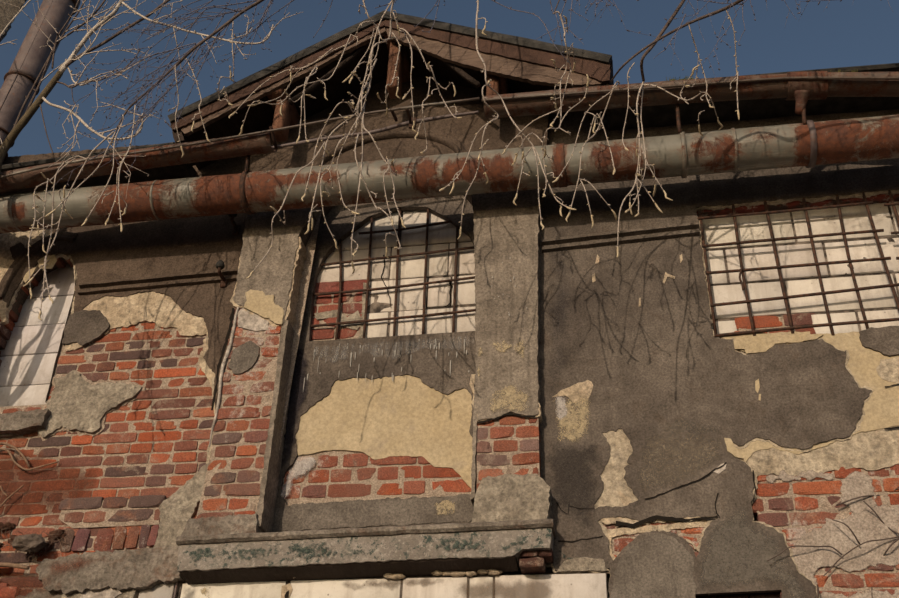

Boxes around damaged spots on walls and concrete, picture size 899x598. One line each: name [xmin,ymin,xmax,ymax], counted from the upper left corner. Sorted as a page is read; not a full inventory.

flaking render [62,289,284,447]
flaking render [273,375,474,532]
crack [645,462,727,518]
flaking render [642,326,899,598]
flaking render [0,567,19,598]
flaking render [80,587,123,598]